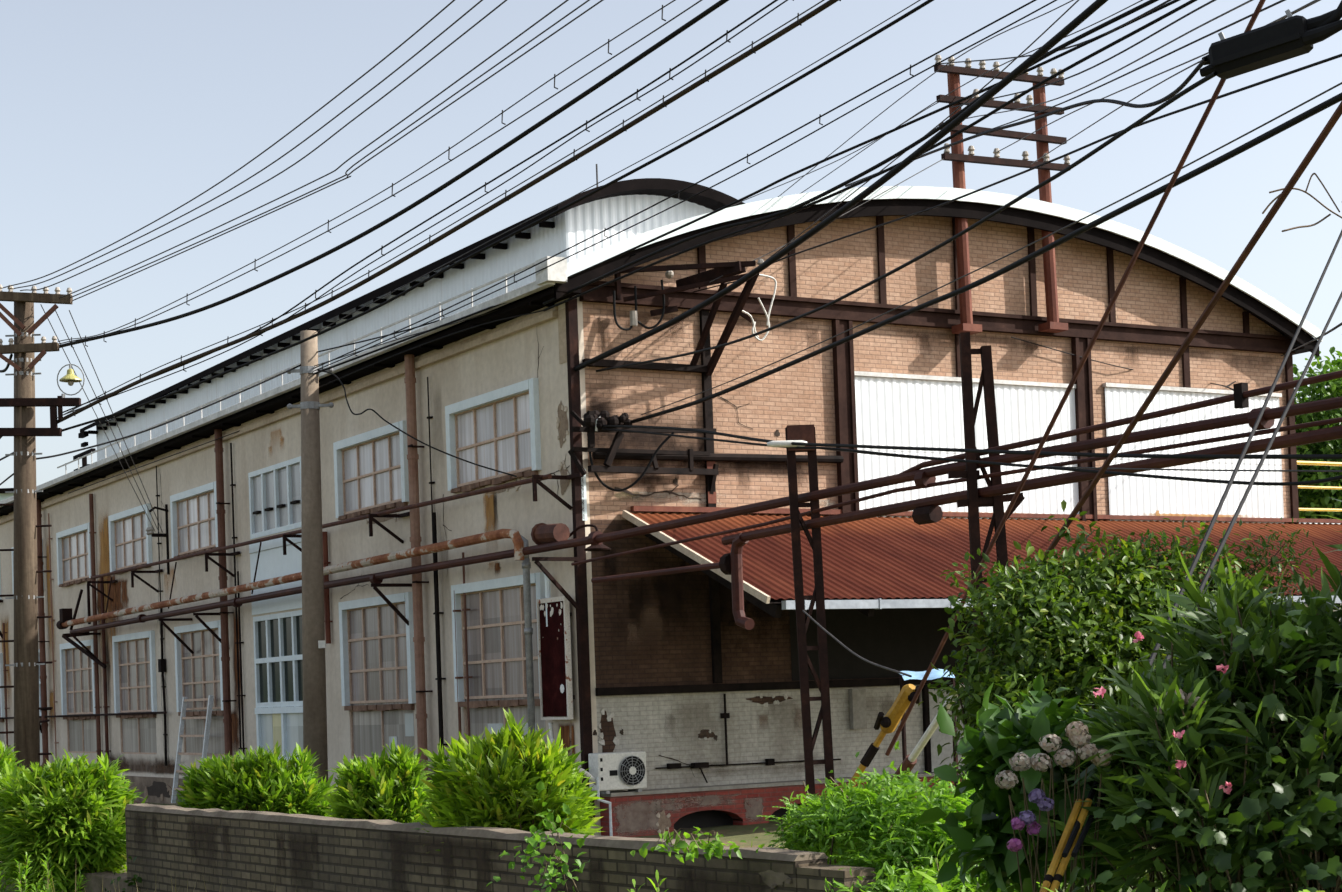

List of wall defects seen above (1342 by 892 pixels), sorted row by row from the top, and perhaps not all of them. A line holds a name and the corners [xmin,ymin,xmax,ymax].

leakage [590,394,612,443]
spalling [556,402,570,495]
rust [97,518,128,668]
peeling [746,694,793,707]
peeling [593,708,624,753]